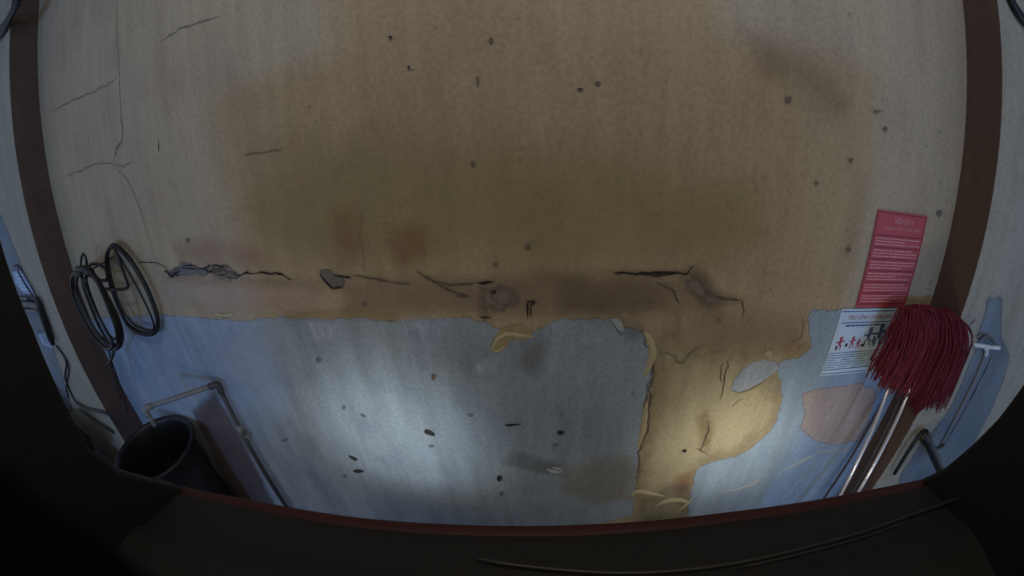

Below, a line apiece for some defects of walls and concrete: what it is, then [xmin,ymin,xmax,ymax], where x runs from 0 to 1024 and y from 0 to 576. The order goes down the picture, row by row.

crack [159,16,219,42]
crack [54,3,148,236]
crack [139,262,292,280]
flaking render [320,266,345,289]
crack [334,272,537,318]
crack [614,265,745,315]
peeling [91,302,653,526]
crack [695,361,729,456]
peeling [687,309,896,517]